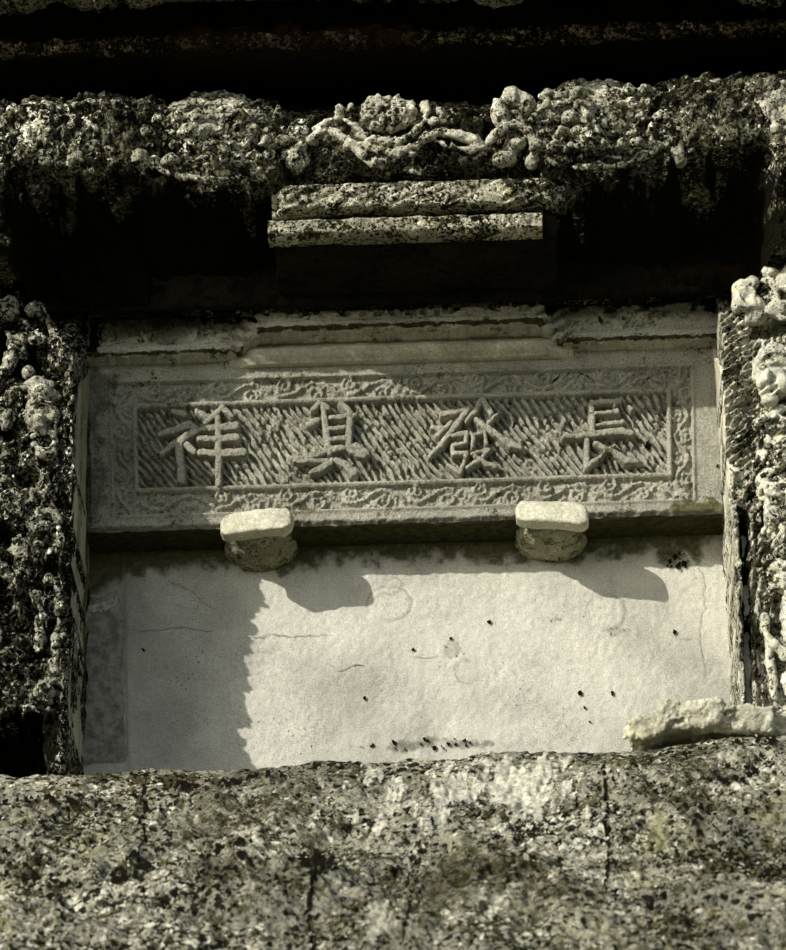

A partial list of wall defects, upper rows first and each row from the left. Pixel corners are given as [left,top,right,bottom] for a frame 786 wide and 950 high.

crack [588,762,617,893]
crack [303,854,317,950]